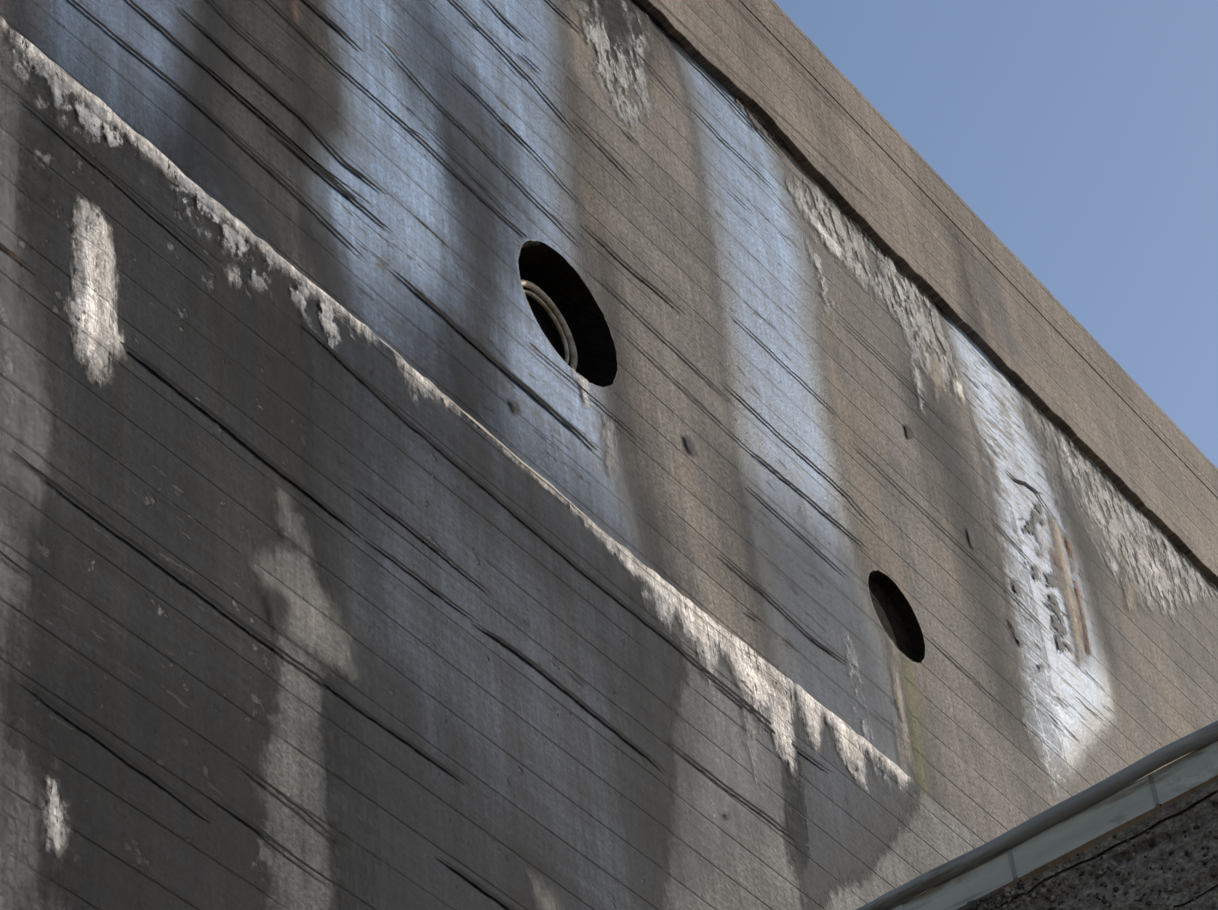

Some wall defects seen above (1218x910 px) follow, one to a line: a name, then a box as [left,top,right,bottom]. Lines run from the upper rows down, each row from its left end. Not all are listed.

peeling [573,0,654,128]
spalling [733,93,795,156]
crack [0,243,42,275]
peeling [785,176,964,410]
leakage [0,0,916,789]
peeling [1009,377,1218,653]
spalling [267,590,289,624]
crack [930,637,1002,705]
leakage [46,783,64,848]
leakage [377,712,560,910]
crack [990,791,1218,910]